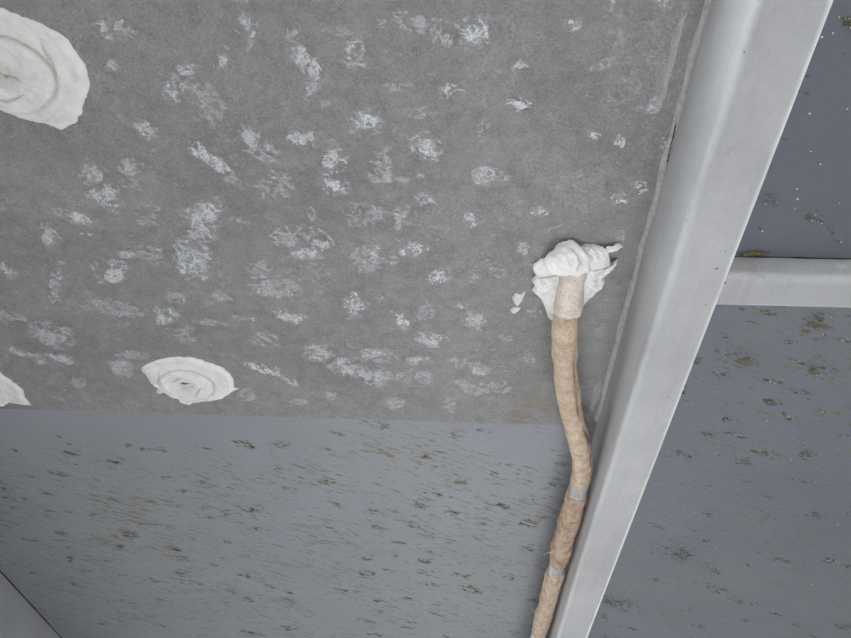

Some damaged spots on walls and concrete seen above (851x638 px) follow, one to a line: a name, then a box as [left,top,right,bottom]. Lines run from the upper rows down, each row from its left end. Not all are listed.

water stain [438,18,489,44]
water stain [292,45,324,95]
water stain [287,131,313,145]
water stain [350,112,380,132]
water stain [190,142,233,182]
water stain [322,140,348,195]
water stain [83,168,119,212]
water stain [71,211,92,224]
water stain [174,203,222,280]
water stain [271,227,328,260]
water stain [97,251,135,283]
water stain [243,362,280,377]